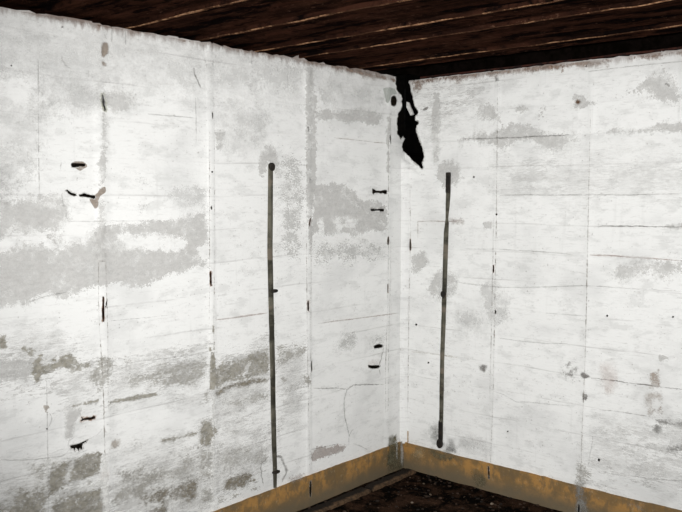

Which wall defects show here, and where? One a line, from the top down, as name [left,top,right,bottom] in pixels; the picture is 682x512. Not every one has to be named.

leakage [305,68,391,242]
spalling [348,68,447,169]
leakage [0,194,68,243]
leakage [0,214,209,306]